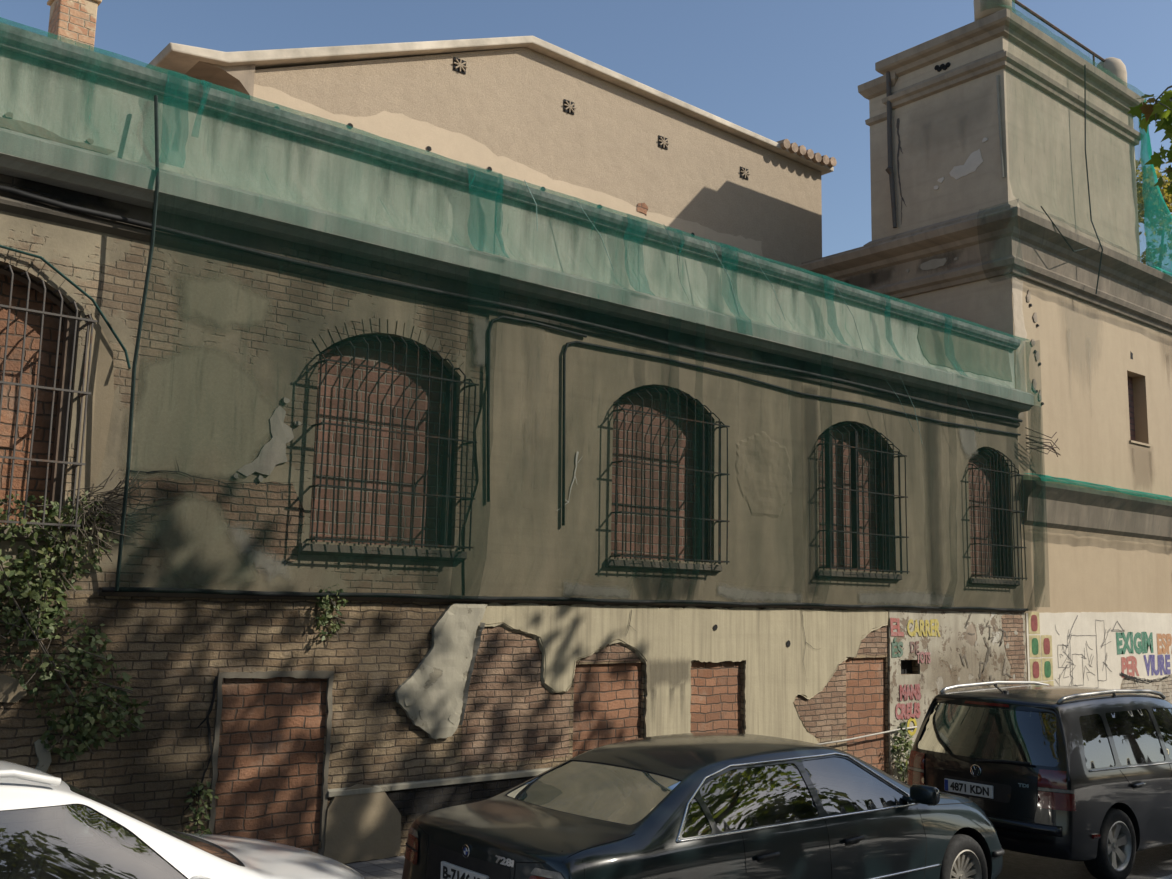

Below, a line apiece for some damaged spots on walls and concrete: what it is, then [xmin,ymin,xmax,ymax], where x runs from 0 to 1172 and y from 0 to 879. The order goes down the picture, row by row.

spalling [934,137,988,190]
flaking render [0,673,27,702]
spalling [395,603,647,766]
spalling [793,624,888,738]